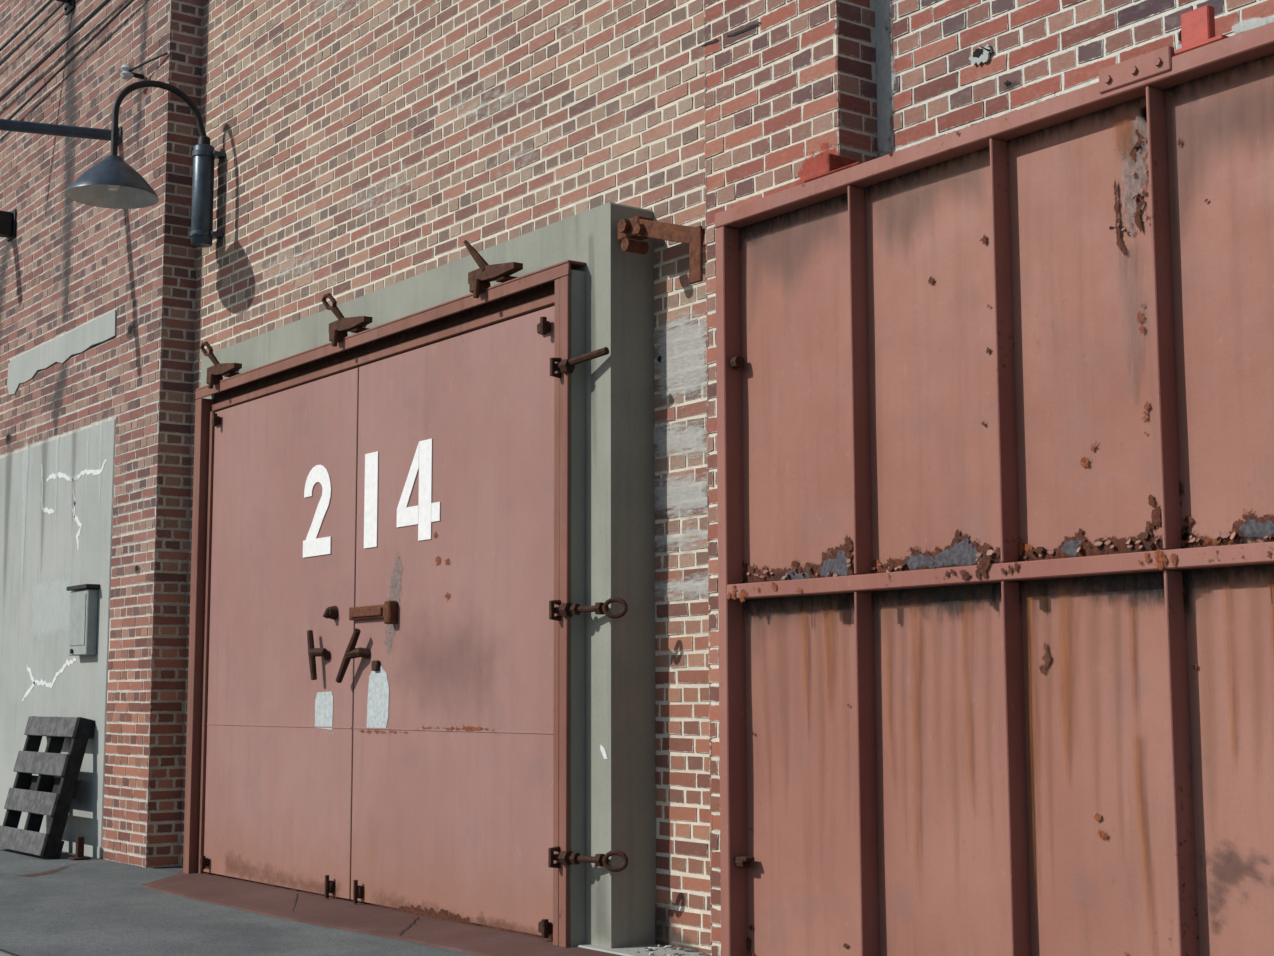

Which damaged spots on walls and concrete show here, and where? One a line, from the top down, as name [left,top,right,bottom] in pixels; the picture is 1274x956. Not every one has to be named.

rust [1145,495,1162,533]
rust [945,554,1018,581]